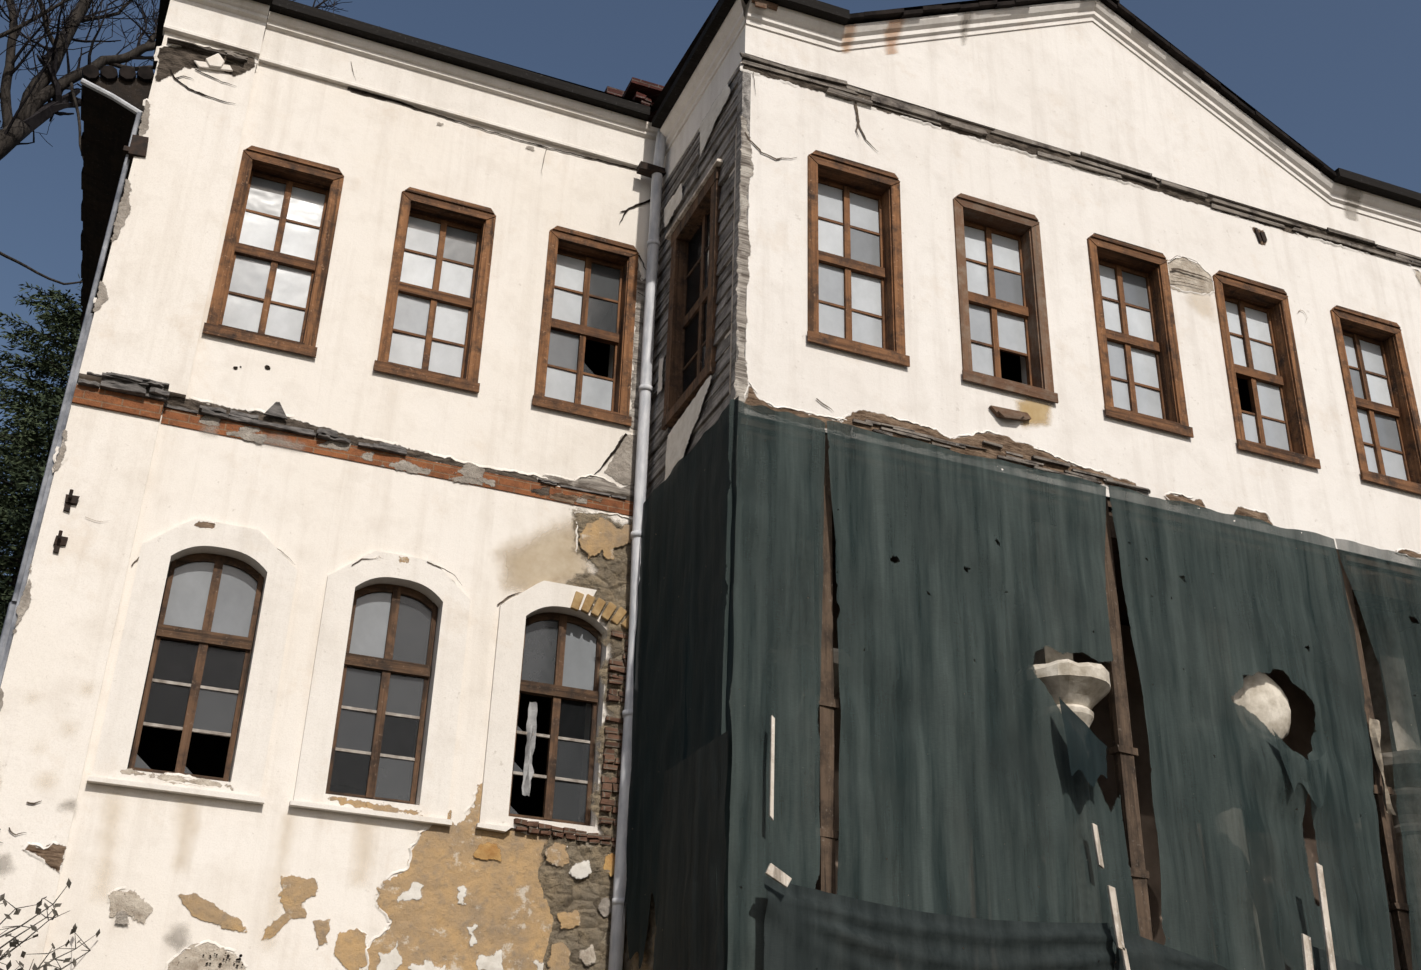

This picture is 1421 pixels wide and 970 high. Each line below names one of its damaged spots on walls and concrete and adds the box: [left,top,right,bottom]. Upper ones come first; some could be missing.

spalling [154,37,258,82]
spalling [139,98,152,136]
crack [854,102,877,151]
spalling [739,52,1421,284]
spalling [1167,255,1215,296]
spalling [734,116,1207,509]
damp [506,524,587,590]
flaking render [164,260,663,970]
spalling [106,886,153,925]